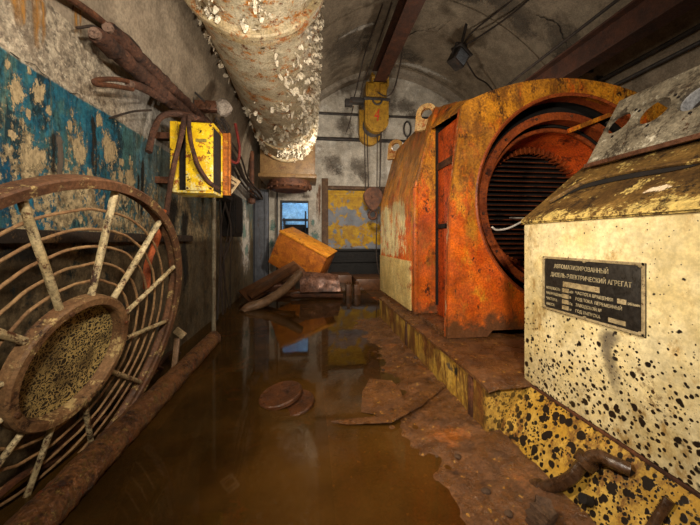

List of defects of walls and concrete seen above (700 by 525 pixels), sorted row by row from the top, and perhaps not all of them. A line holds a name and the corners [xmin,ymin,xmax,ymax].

rust [11,0,45,39]
peeling [5,59,52,120]
peeling [8,130,54,175]
peeling [66,120,93,176]
peeling [96,110,137,187]
damp [351,159,368,182]